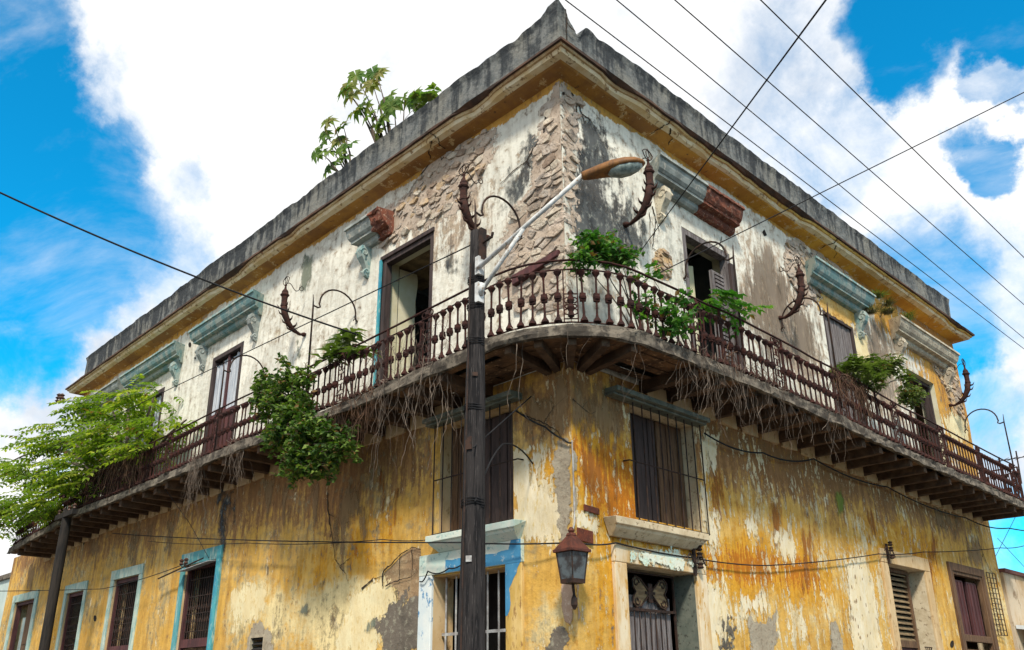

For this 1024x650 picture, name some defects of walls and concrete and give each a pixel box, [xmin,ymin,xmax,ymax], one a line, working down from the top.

spalling [376,128,502,251]
spalling [496,81,586,321]
water stain [576,120,611,170]
water stain [570,190,647,254]
water stain [217,490,235,551]
peeling [513,438,600,555]
corrosion [573,444,618,516]
peeling [699,432,721,553]
peeling [770,525,801,567]
peeling [328,548,421,650]
peeling [707,579,779,650]
peeling [830,550,883,650]